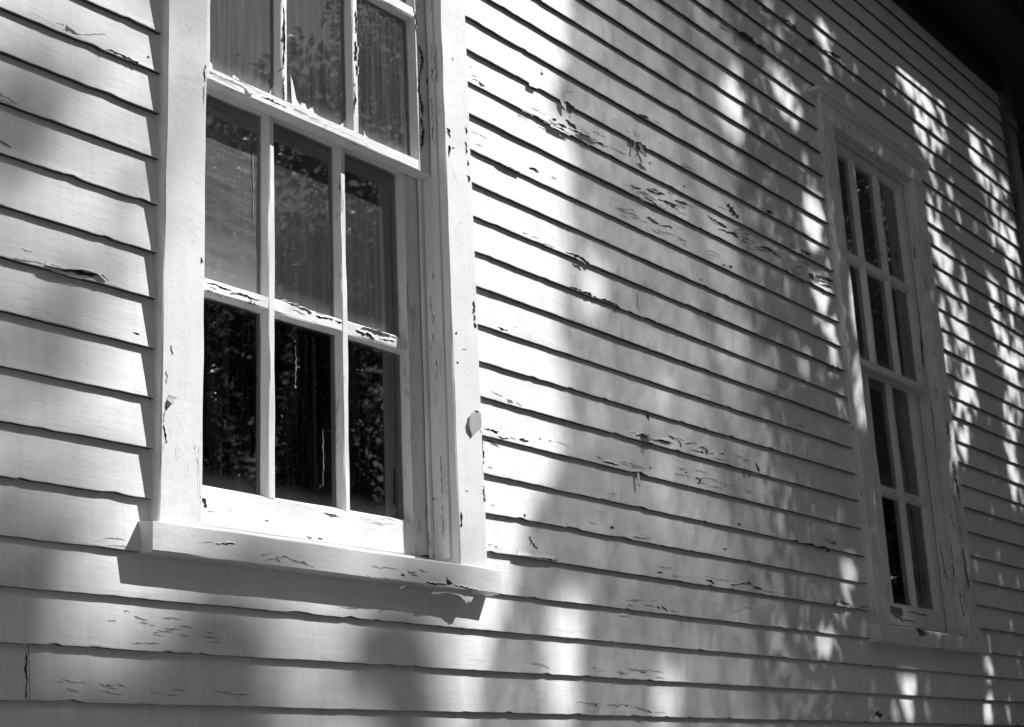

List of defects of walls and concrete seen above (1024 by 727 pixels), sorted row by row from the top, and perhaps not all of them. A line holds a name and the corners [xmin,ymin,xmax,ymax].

peeling [203,7,308,115]
peeling [521,91,626,155]
peeling [499,160,539,174]
peeling [12,249,108,282]
peeling [755,243,840,292]
peeling [205,281,260,306]
peeling [282,300,343,323]
peeling [356,327,399,342]
peeling [468,409,569,468]
peeling [630,430,760,474]